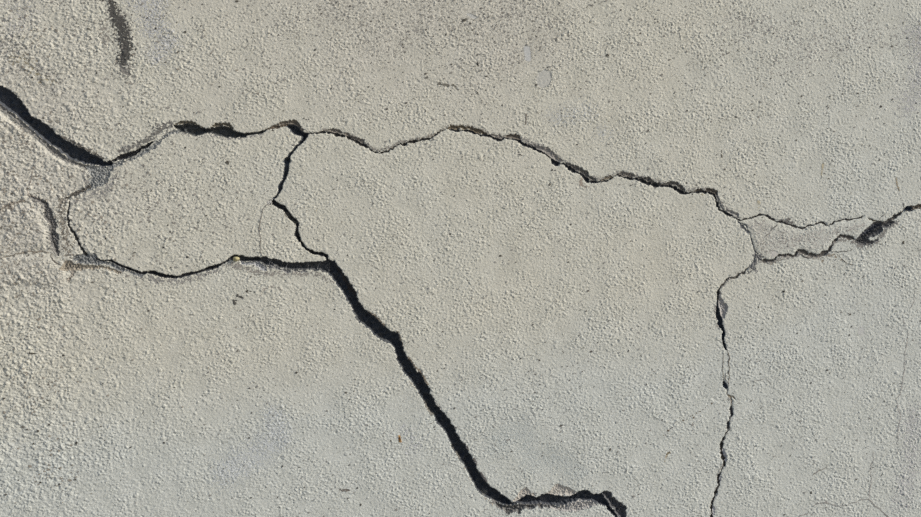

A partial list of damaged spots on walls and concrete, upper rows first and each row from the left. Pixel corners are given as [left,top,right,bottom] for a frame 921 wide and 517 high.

crack [0,86,154,167]
crack [0,124,921,517]